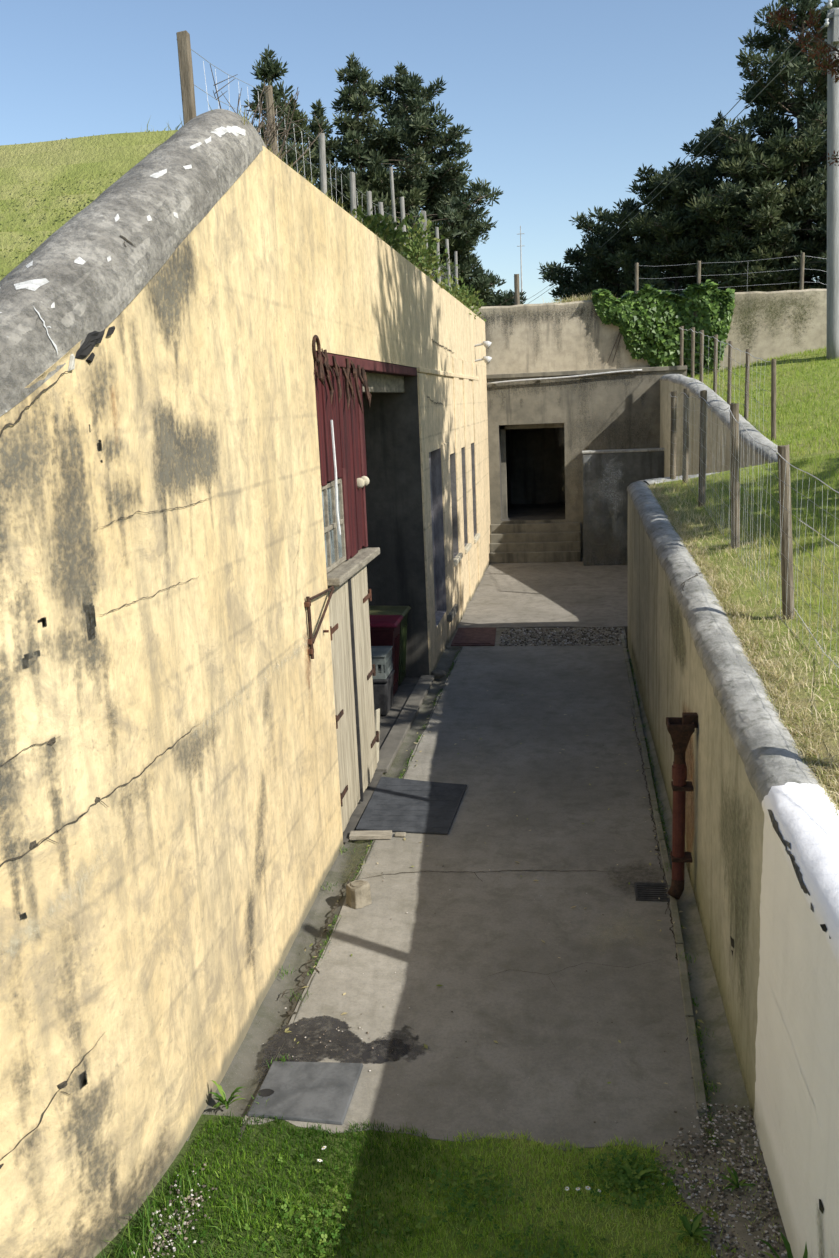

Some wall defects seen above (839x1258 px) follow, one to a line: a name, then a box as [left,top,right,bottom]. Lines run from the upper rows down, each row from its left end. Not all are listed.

leakage [148,236,194,341]
crack [0,307,70,437]
spalling [68,326,115,371]
leakage [0,405,98,606]
leakage [103,438,122,458]
leakage [109,483,141,517]
leakage [153,408,218,502]
leakage [60,632,105,665]
leakage [0,597,38,860]
leakage [45,745,56,775]
crack [0,726,195,867]
crack [0,1035,103,1169]